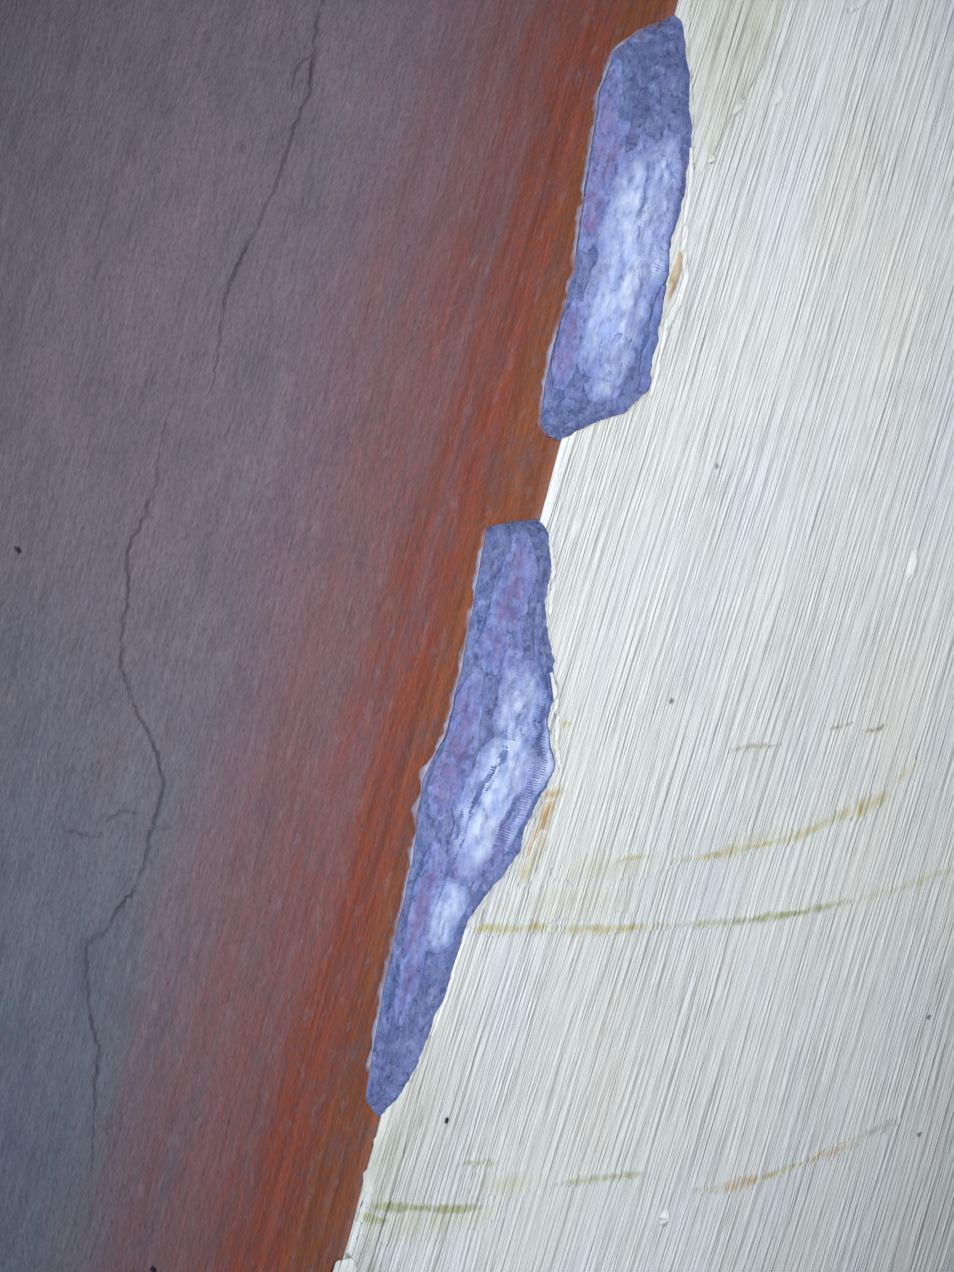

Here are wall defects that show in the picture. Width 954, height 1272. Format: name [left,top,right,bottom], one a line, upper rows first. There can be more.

crack [206,0,325,394]
spalling [536,0,784,441]
crack [56,420,174,1172]
spalling [365,520,563,1117]
rust [515,784,564,887]